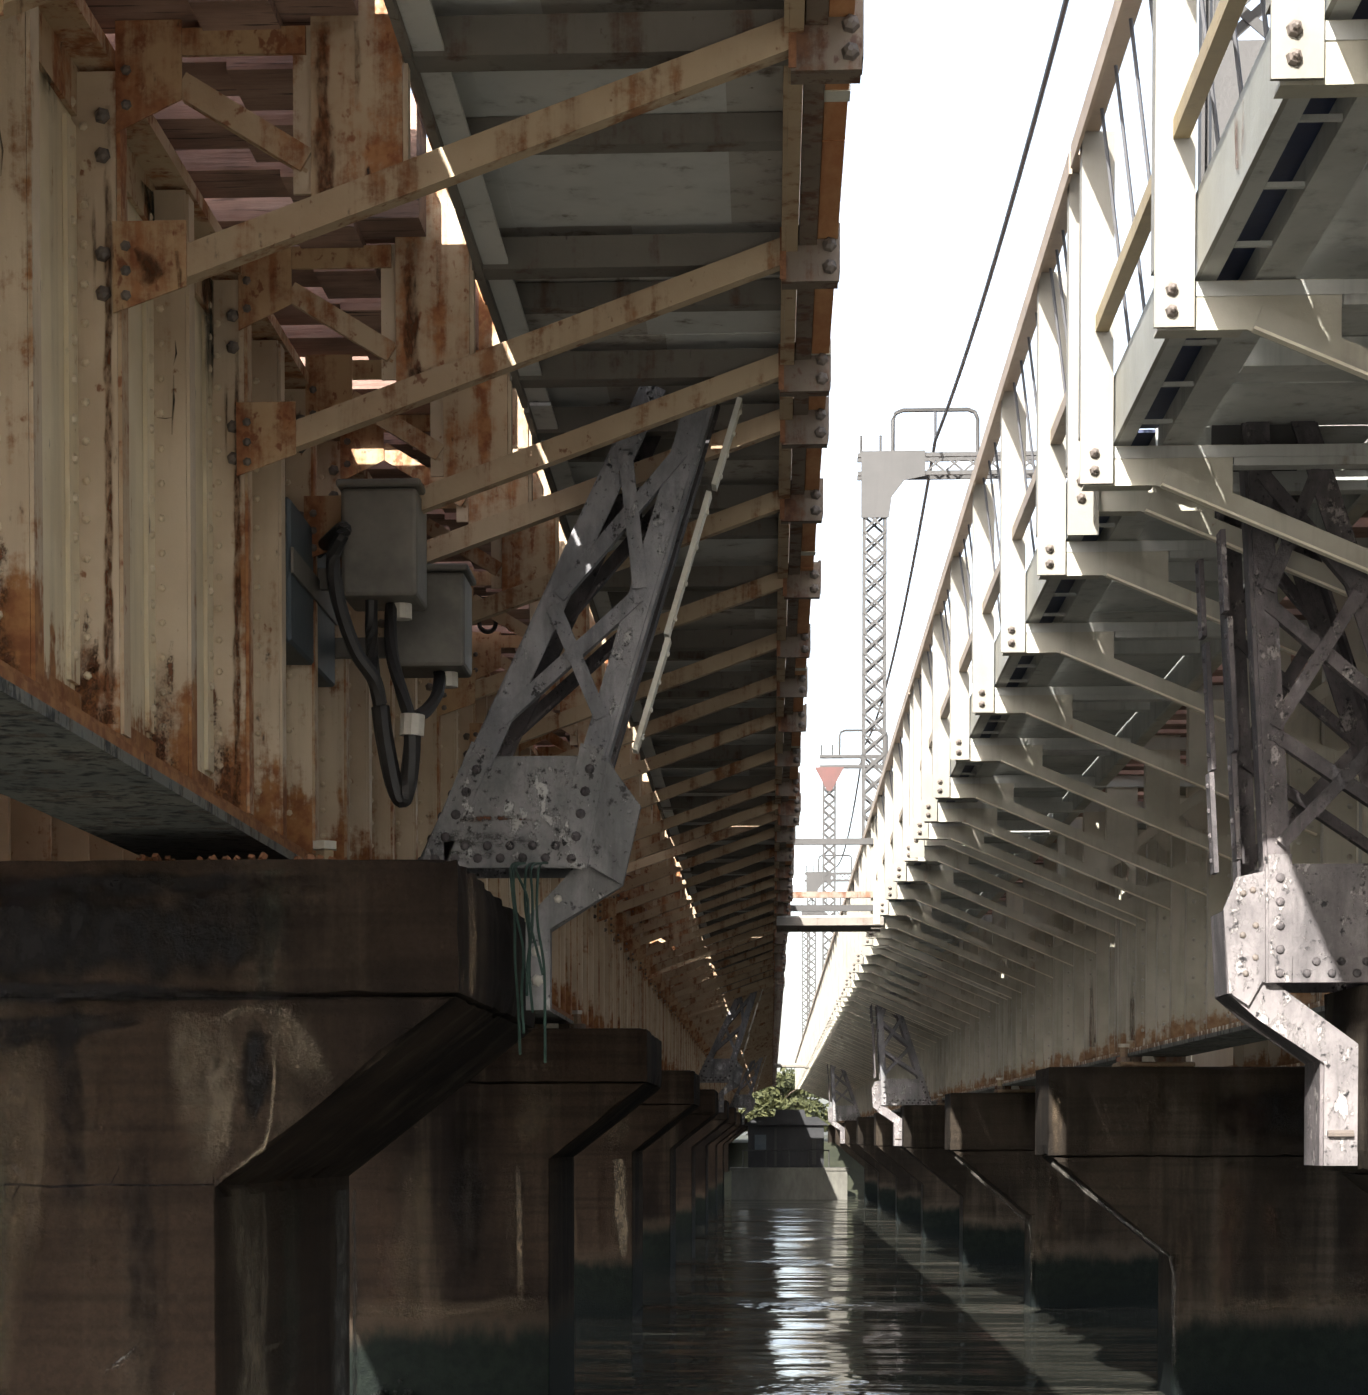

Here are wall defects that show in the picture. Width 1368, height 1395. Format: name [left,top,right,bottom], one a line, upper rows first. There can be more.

corrosion [135,250,182,284]
corrosion [233,452,241,805]
damp [0,872,278,1129]
damp [212,1031,276,1167]
damp [1052,1163,1176,1343]